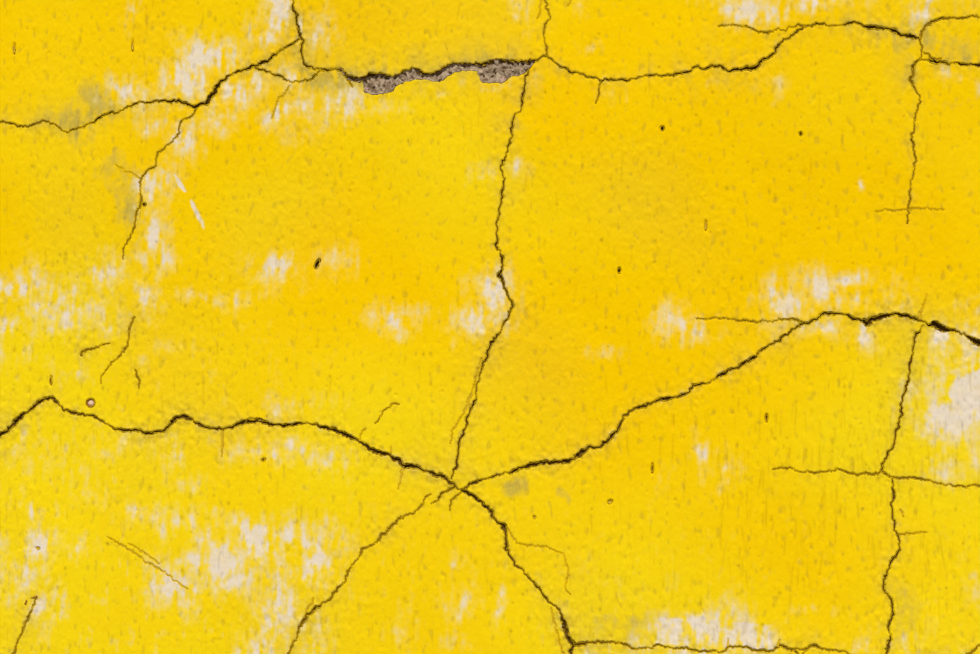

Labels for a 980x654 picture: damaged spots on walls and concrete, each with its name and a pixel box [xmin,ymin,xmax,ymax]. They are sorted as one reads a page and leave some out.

crack [0,0,353,259]
peeling [0,0,543,385]
crack [449,69,529,479]
crack [535,0,980,224]
peeling [0,385,362,654]
peeling [380,545,511,654]
crack [0,295,980,654]